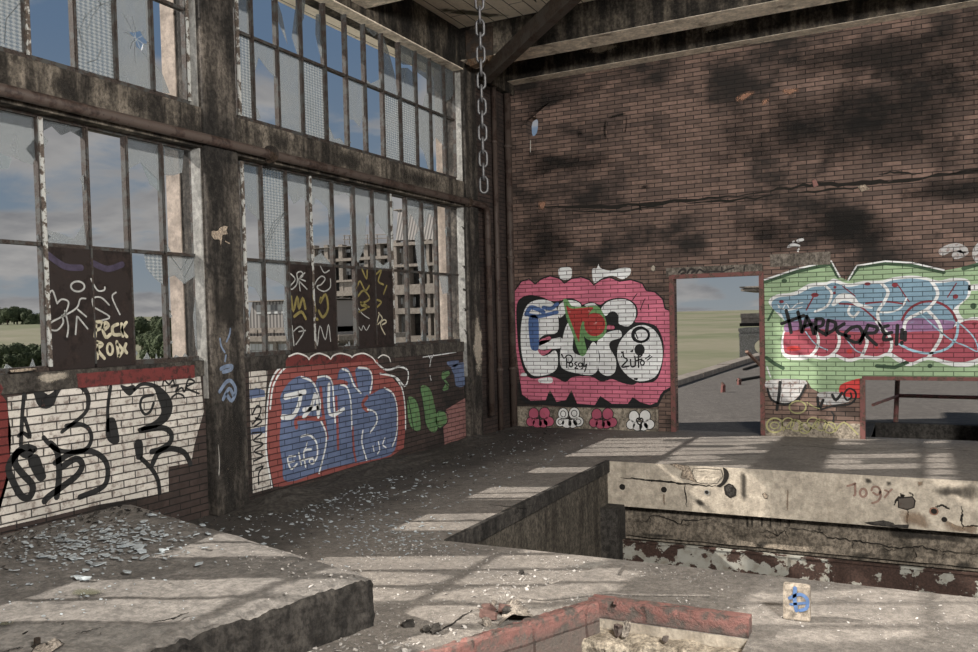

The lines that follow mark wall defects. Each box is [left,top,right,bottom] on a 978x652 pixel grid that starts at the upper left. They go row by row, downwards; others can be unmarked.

crack [536,168,978,213]